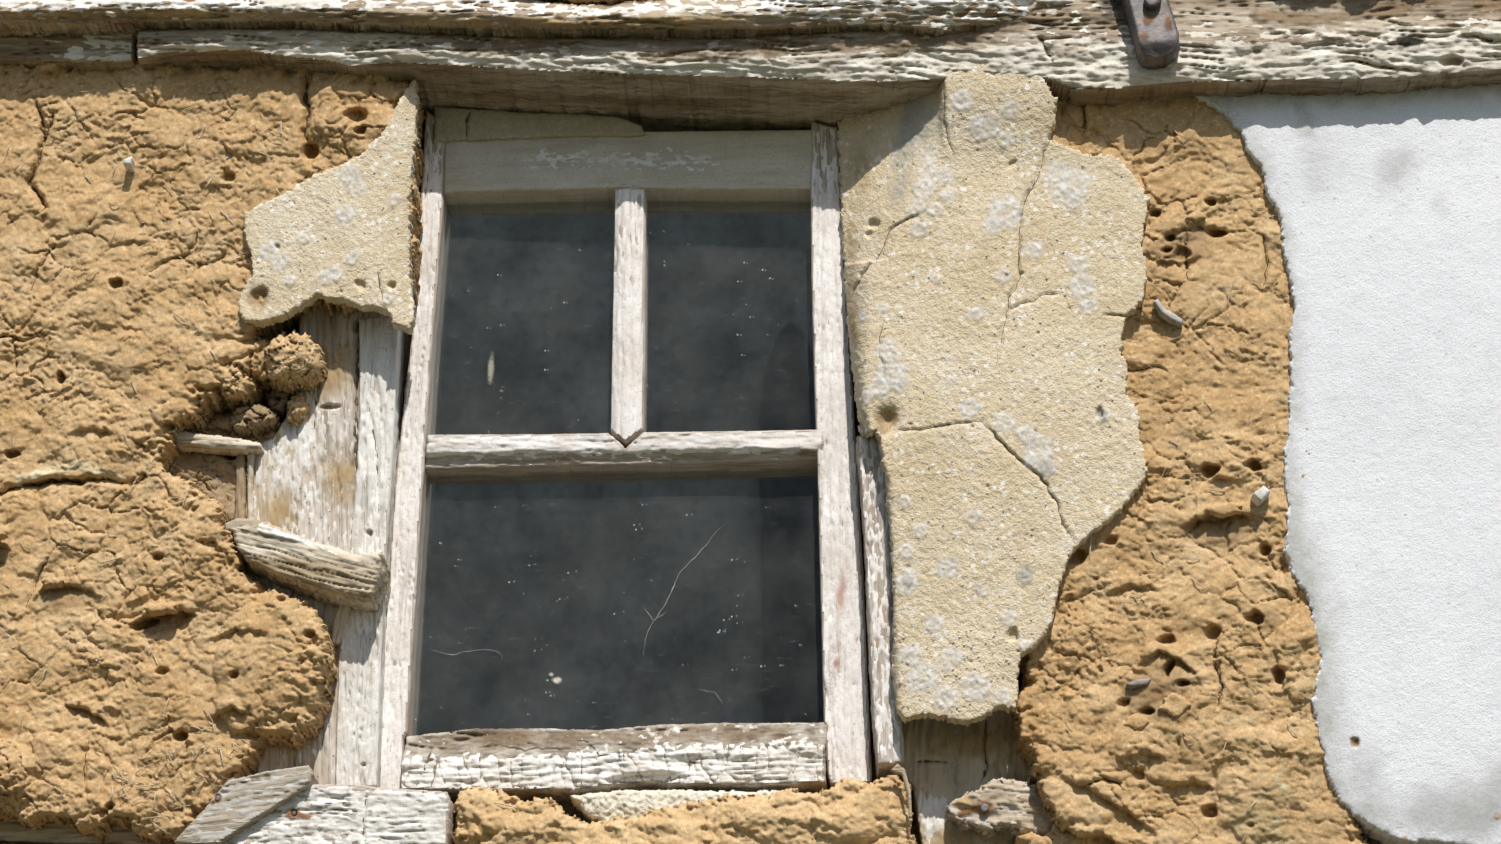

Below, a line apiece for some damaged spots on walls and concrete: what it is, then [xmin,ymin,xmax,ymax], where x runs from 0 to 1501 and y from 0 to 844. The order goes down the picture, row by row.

peeling [0,0,1501,89]
crack [303,74,313,150]
crack [27,102,54,216]
spalling [123,156,136,173]
crack [146,232,198,273]
crack [996,107,1087,365]
spalling [1148,211,1206,259]
crack [0,465,159,495]
crack [893,420,1075,543]
spalling [1192,486,1271,543]
spalling [143,603,183,633]
spalling [1123,668,1191,730]